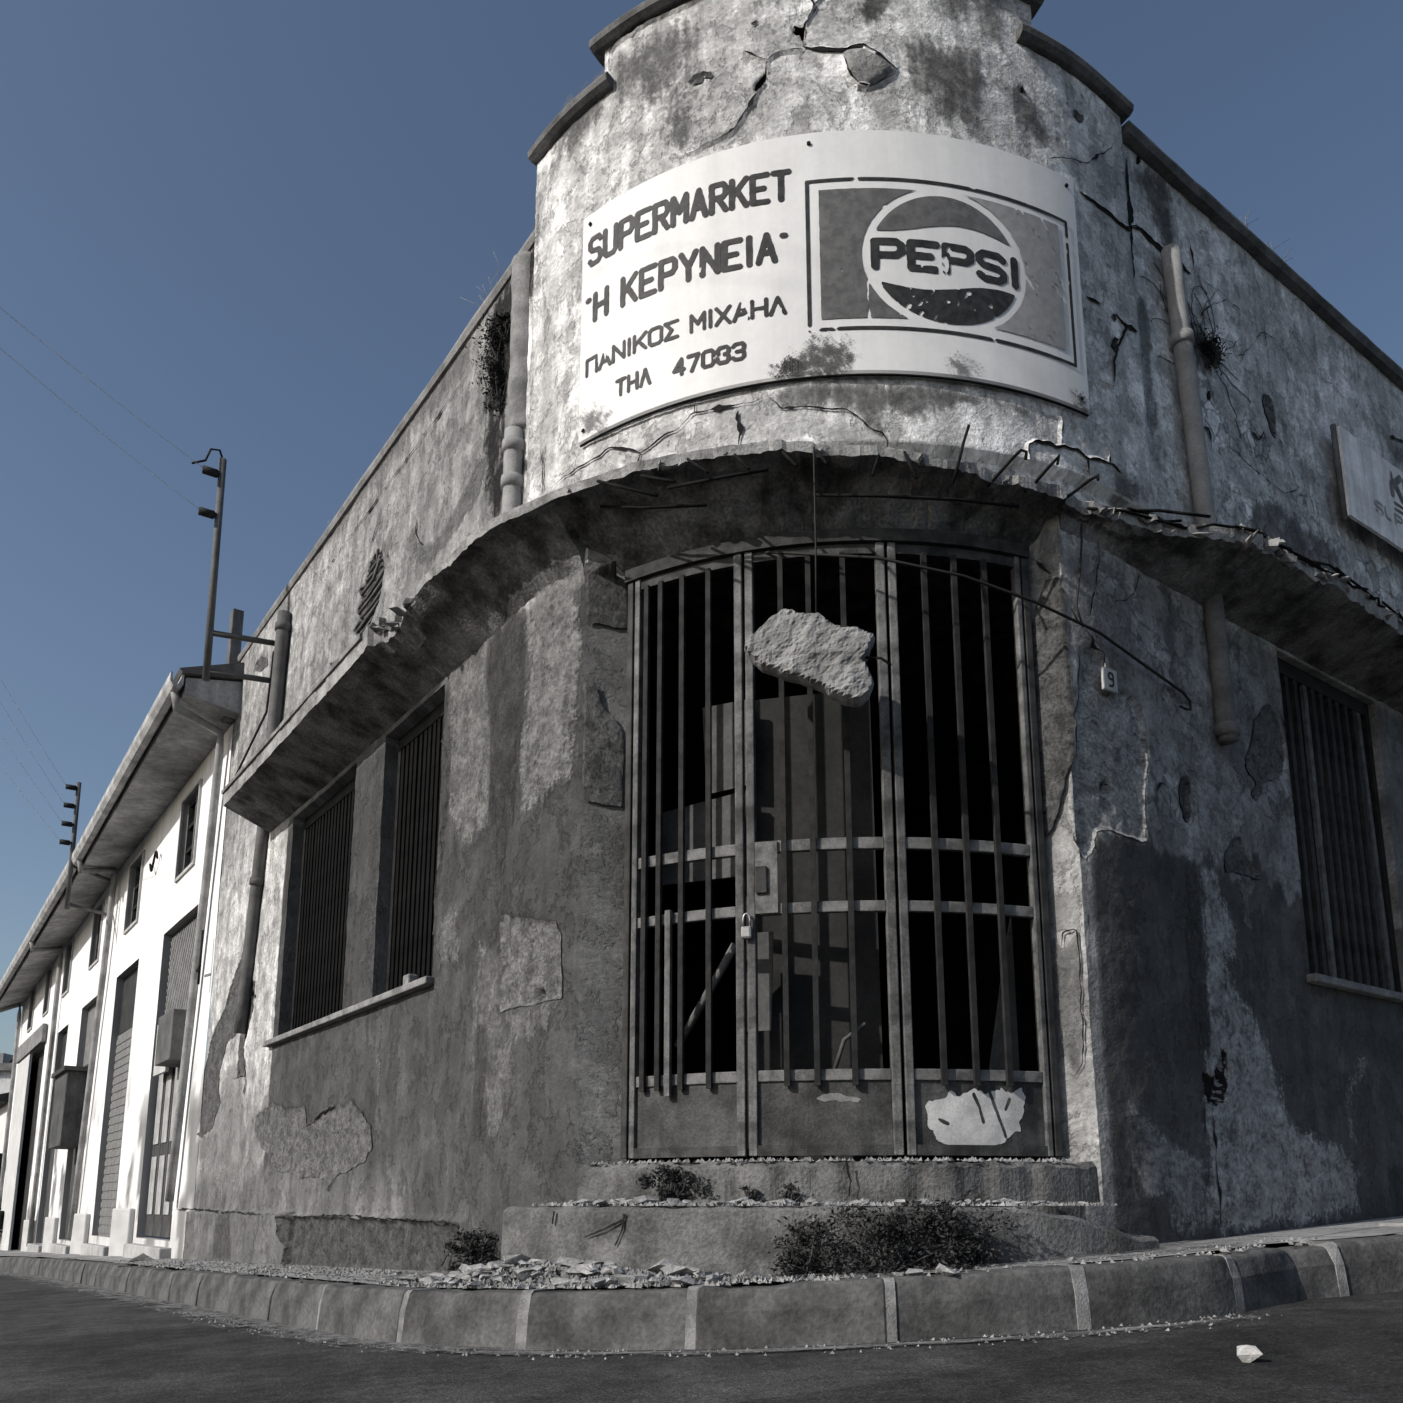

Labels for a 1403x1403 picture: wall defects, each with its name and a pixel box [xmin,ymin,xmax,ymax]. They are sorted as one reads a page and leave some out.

crack [608,0,703,70]
crack [686,0,899,157]
crack [1041,144,1344,493]
flaking render [1178,775,1191,822]
flaking render [1246,704,1284,801]
peeling [438,911,459,965]
flaking render [197,952,256,1137]
flaking render [472,914,562,1136]
peeling [1133,837,1360,1235]
flaking render [254,1101,372,1185]
crack [1204,1106,1222,1223]